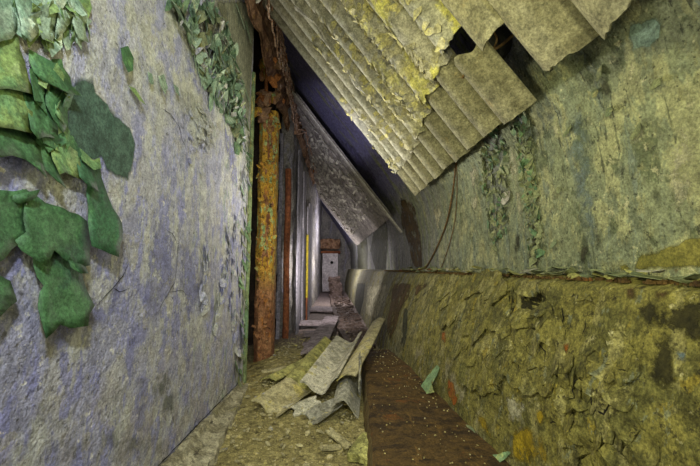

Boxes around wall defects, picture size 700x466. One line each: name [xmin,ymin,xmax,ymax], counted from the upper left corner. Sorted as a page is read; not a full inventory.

peeling [0,0,123,338]
peeling [121,46,134,72]
rust [245,0,319,186]
peeling [294,0,445,154]
damp [401,198,422,268]
peeling [401,108,700,466]
crack [572,378,609,415]
damp [640,292,700,385]